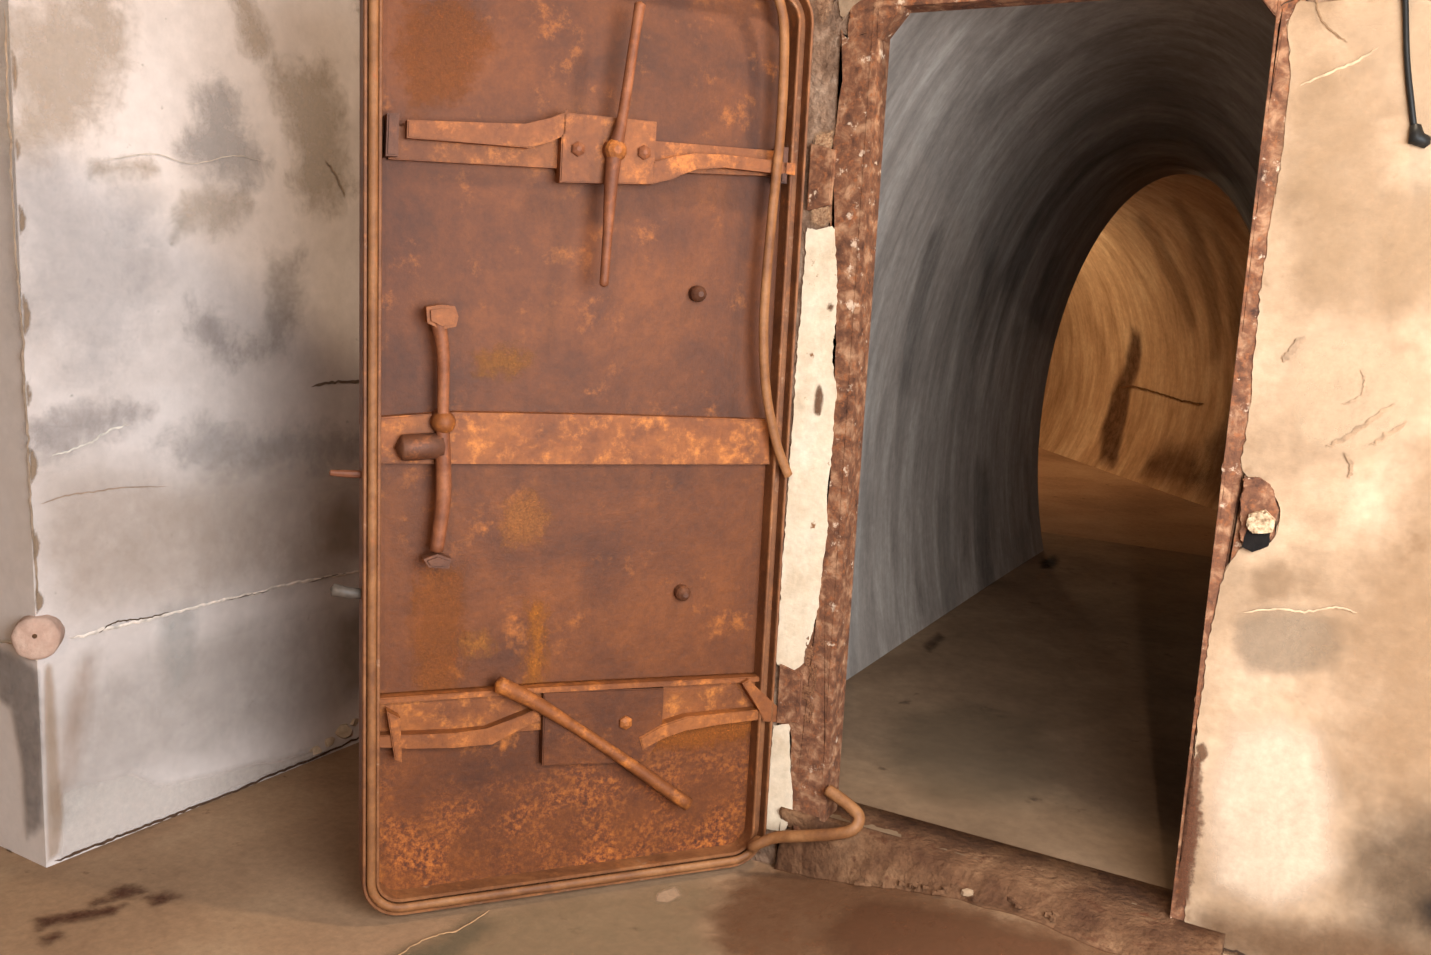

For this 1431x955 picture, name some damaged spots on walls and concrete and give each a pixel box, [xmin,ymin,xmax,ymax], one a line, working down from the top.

crack [106,153,260,164]
leakage [189,92,258,177]
crack [4,9,165,612]
crack [72,570,359,638]
crack [1239,606,1356,614]
spalling [802,636,822,724]
leakage [0,653,40,827]
rust [656,721,751,748]
rust [1176,755,1203,910]
leakage [714,870,1117,955]